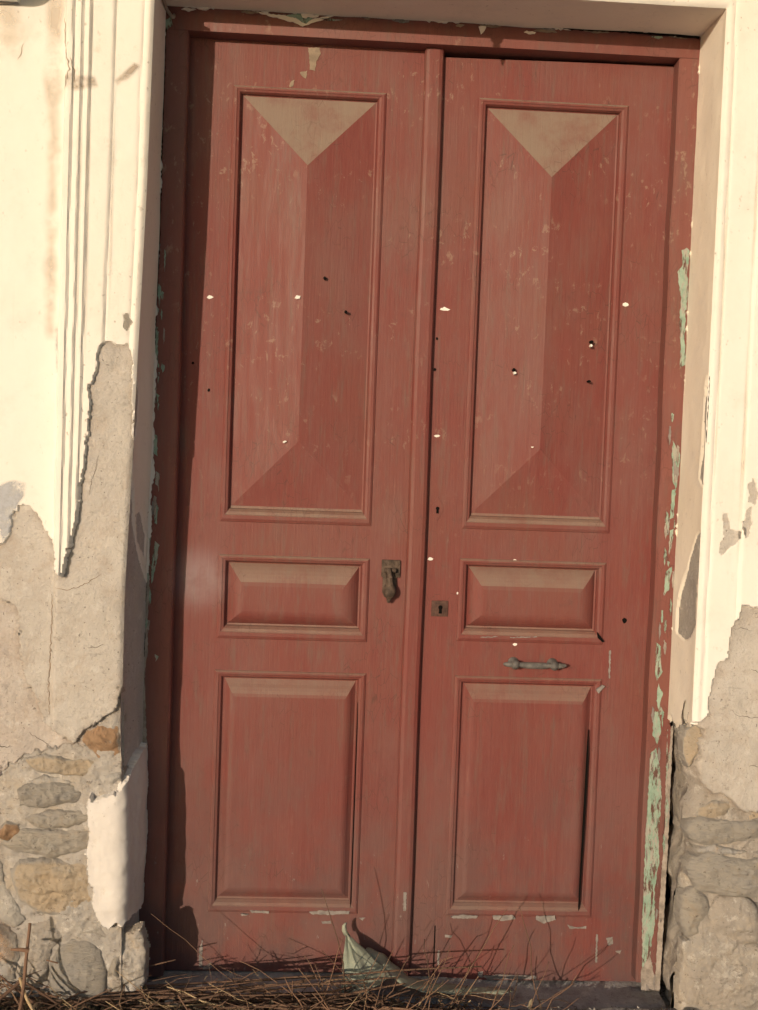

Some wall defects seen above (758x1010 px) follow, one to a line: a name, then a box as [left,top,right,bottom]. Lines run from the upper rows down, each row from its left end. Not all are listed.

spalling [0,342,164,1009]
peeling [123,313,133,330]
spalling [641,413,758,1010]
peeling [700,387,708,484]